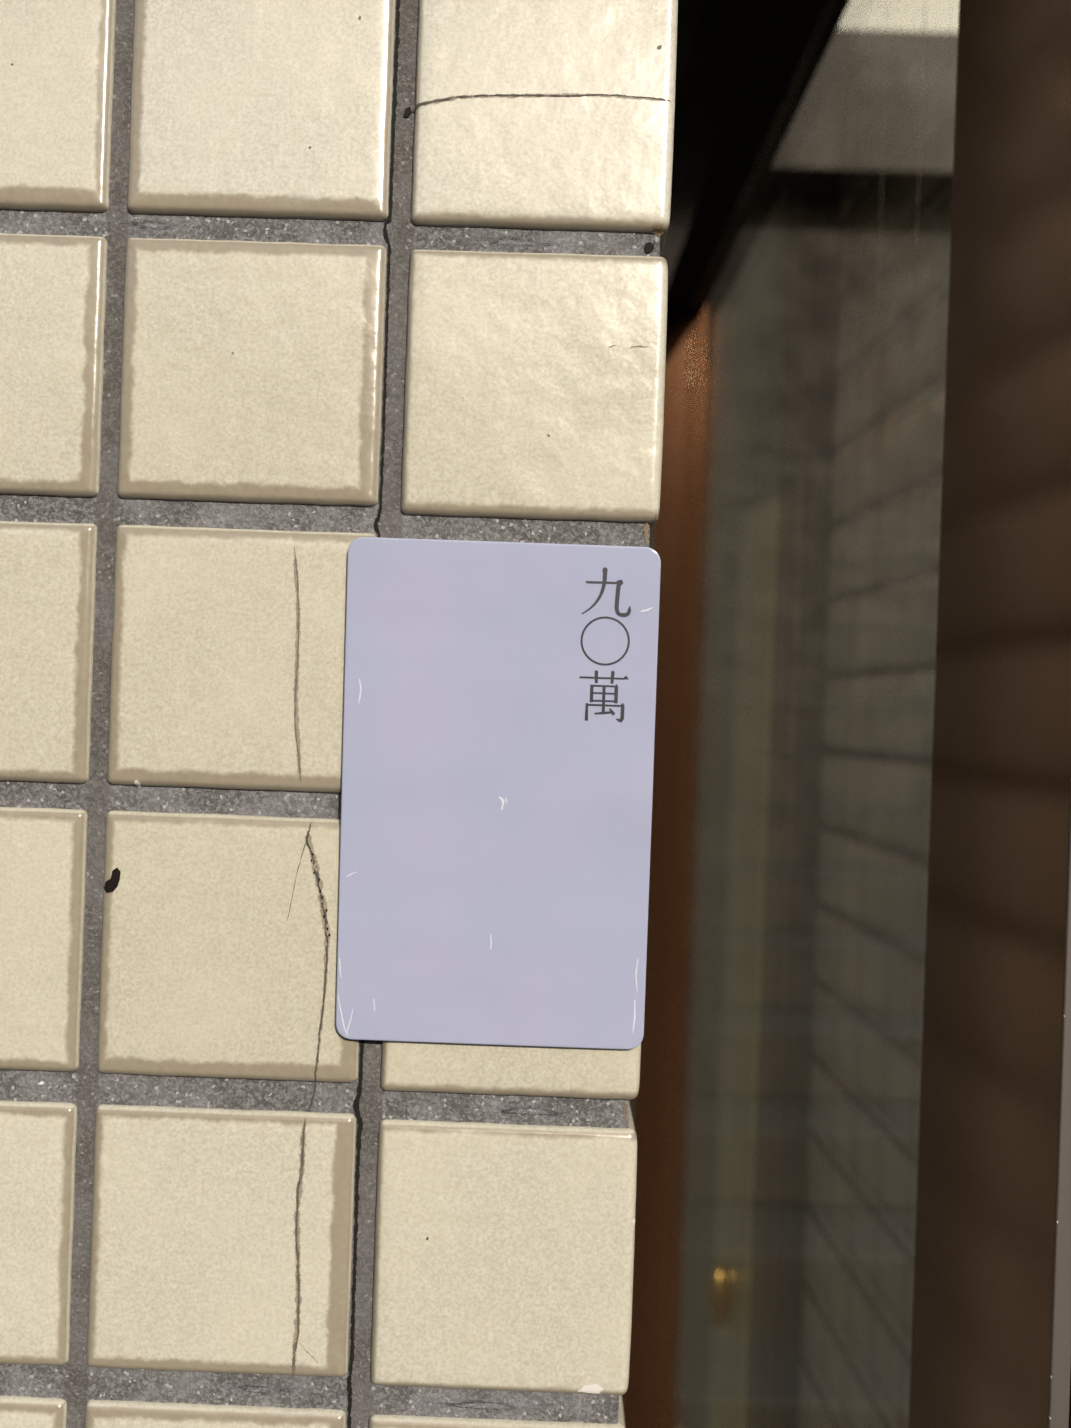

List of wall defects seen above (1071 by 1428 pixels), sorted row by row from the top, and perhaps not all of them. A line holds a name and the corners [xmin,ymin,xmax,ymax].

crack [403,94,670,117]
crack [293,548,301,781]
crack [287,824,331,1375]